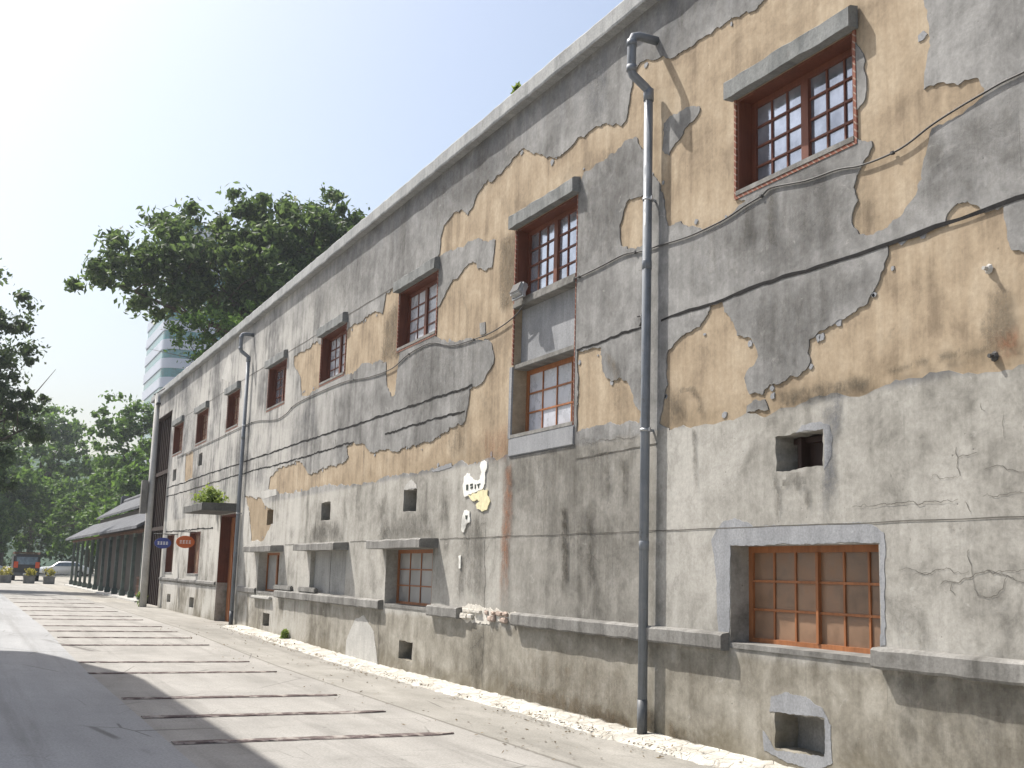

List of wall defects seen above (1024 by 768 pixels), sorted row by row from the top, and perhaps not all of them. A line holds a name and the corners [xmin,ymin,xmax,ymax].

flaking render [245,0,1024,542]
crack [859,450,1022,512]
crack [901,551,1024,598]
peeling [460,608,508,623]